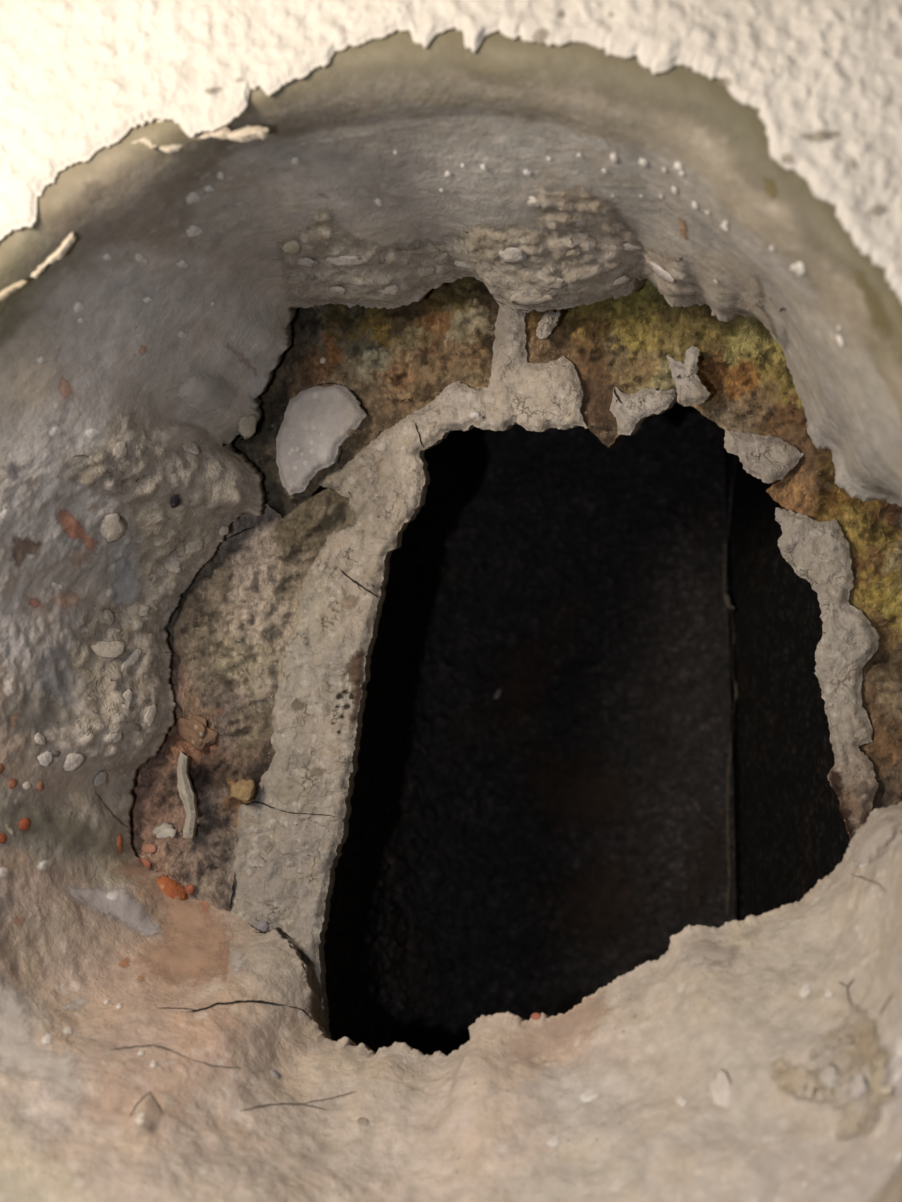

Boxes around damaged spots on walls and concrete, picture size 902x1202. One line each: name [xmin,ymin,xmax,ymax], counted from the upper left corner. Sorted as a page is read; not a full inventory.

peeling [0,118,269,300]
peeling [237,27,902,359]
leakage [0,281,31,314]
spalling [238,415,257,440]
spalling [26,413,254,787]
crack [161,1000,312,1021]
crack [111,1044,239,1068]